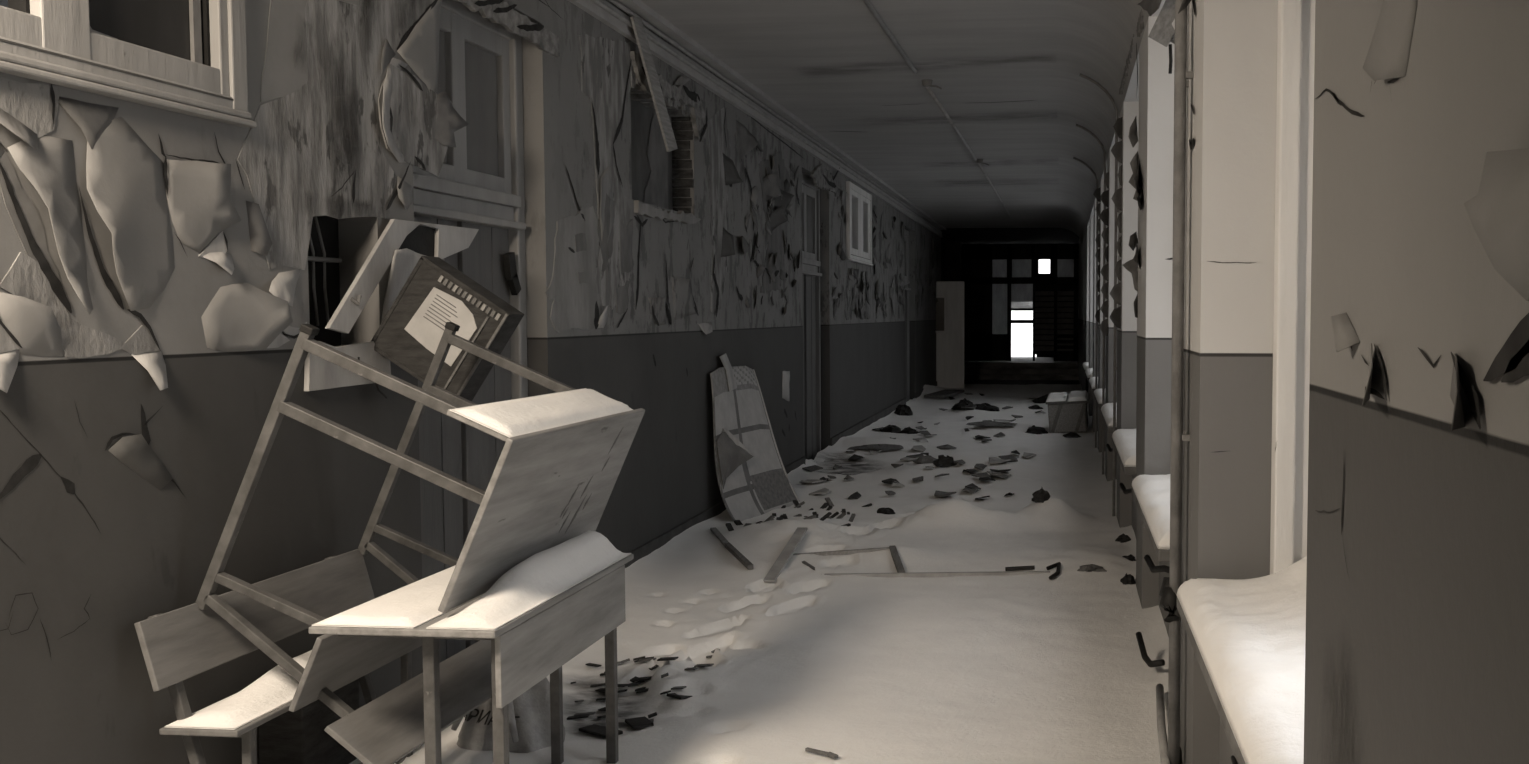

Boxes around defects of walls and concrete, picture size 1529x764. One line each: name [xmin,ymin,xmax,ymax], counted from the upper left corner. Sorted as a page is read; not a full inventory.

peeling [0,0,560,393]
peeling [579,33,708,329]
peeling [745,144,907,320]
peeling [1093,117,1143,336]
peeling [1331,313,1387,406]
peeling [1418,148,1529,430]
crack [0,410,100,532]
crack [0,538,91,657]